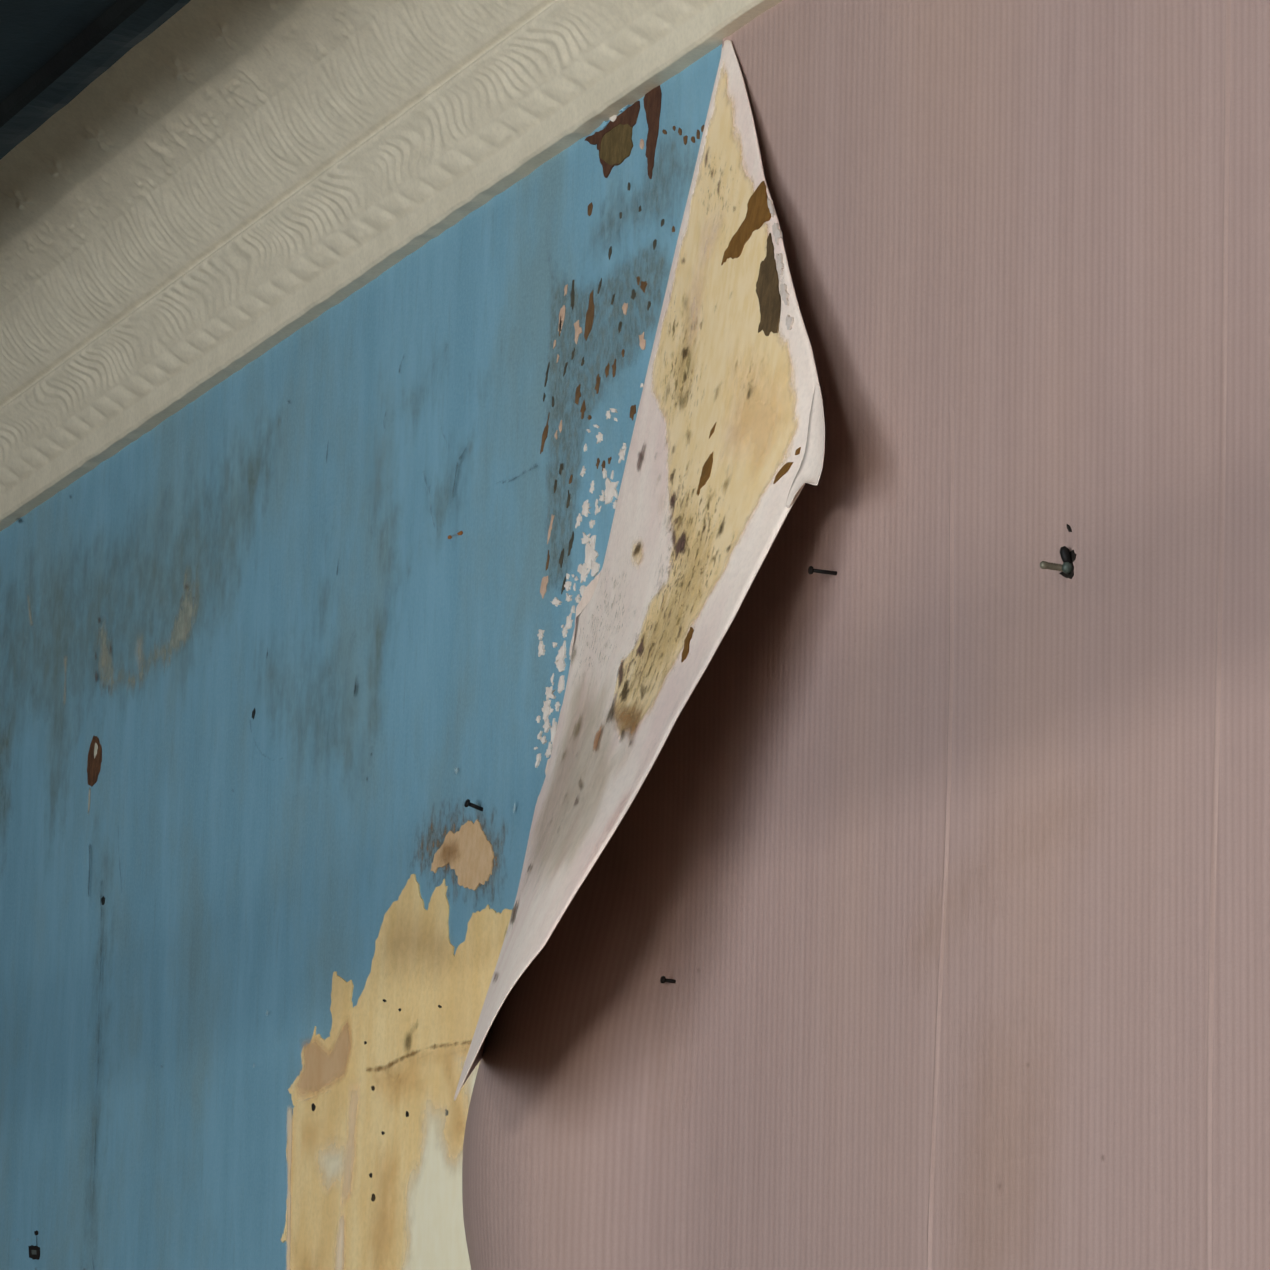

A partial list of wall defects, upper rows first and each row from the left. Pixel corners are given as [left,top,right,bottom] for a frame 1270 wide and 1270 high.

peeling [585,86,662,179]
peeling [534,408,627,768]
leakage [540,69,797,750]
peeling [281,820,512,1270]